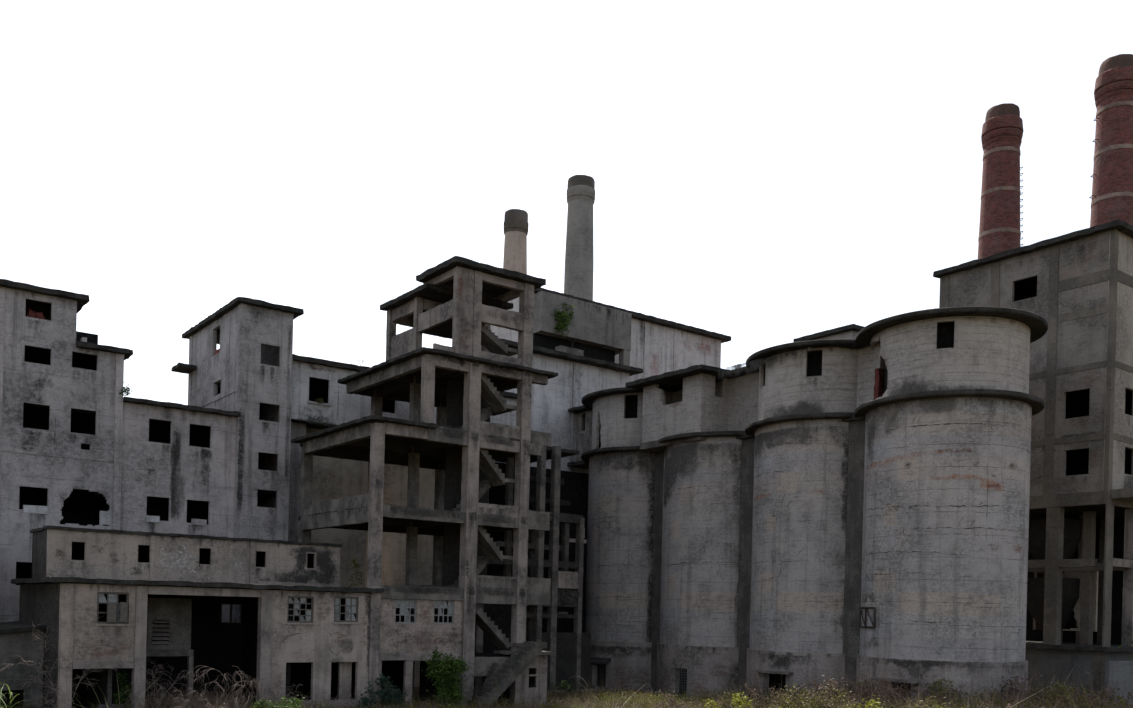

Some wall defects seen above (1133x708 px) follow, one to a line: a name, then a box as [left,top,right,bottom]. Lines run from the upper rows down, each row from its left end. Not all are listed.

damp [600,444,715,551]
damp [257,548,345,594]